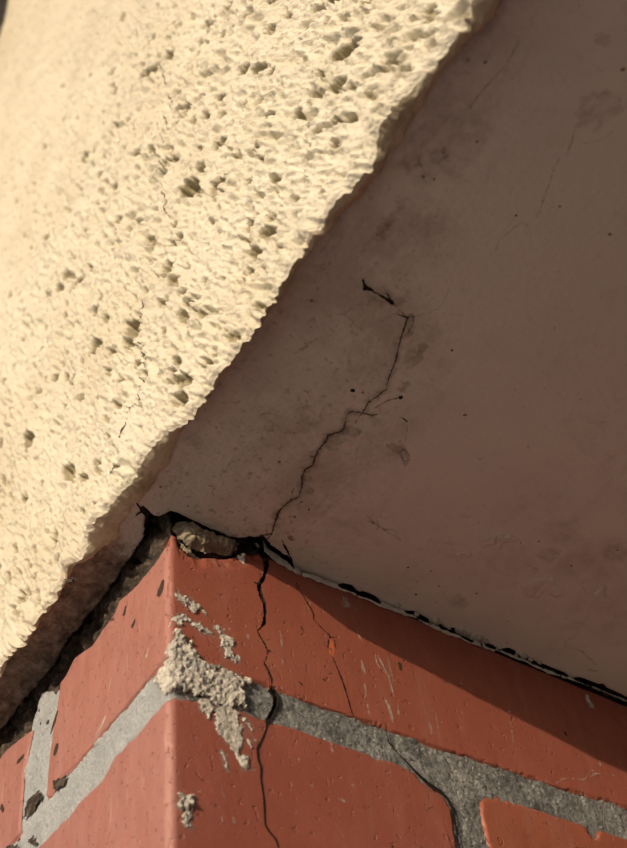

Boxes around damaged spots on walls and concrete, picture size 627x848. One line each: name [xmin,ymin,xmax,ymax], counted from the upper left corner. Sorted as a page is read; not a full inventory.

crack [136,503,150,525]
spalling [171,521,246,564]
crack [254,279,414,848]
peeling [214,704,256,769]